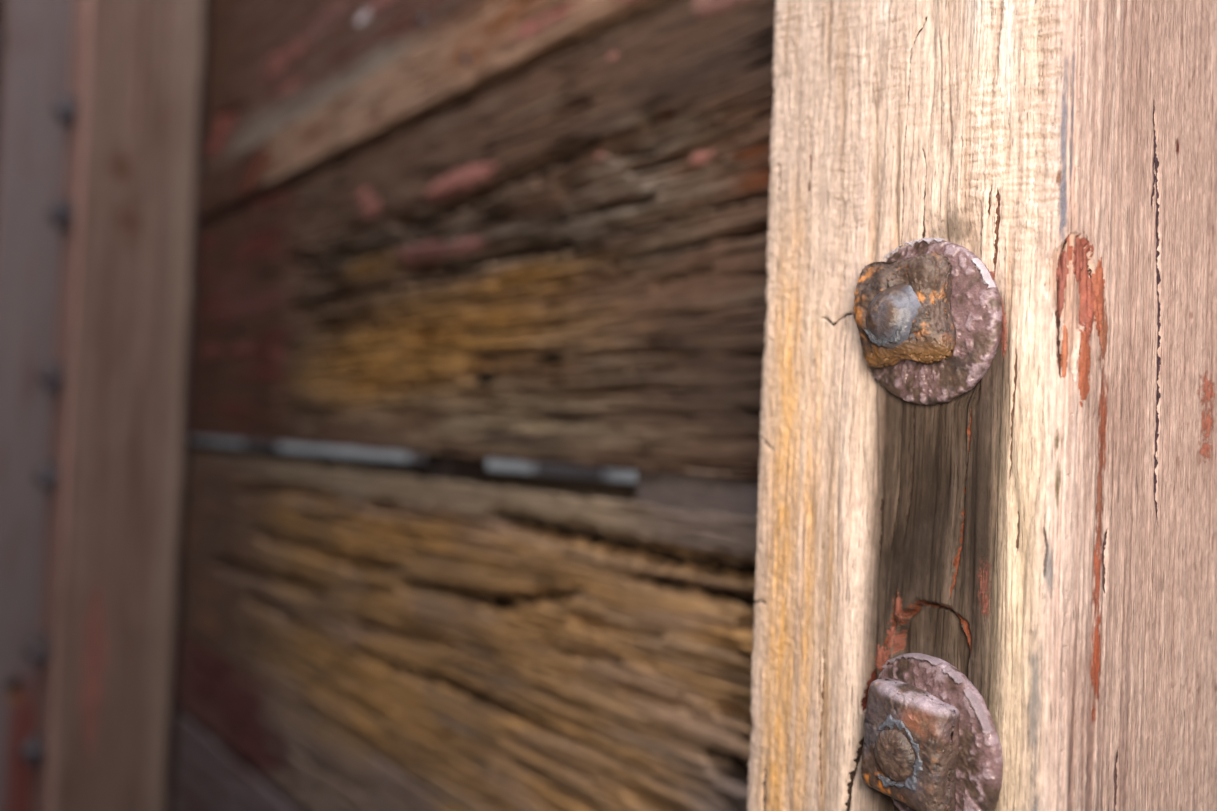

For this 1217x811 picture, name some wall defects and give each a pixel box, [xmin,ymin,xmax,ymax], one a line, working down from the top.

crack [1151,104,1161,526]
crack [818,403,972,811]